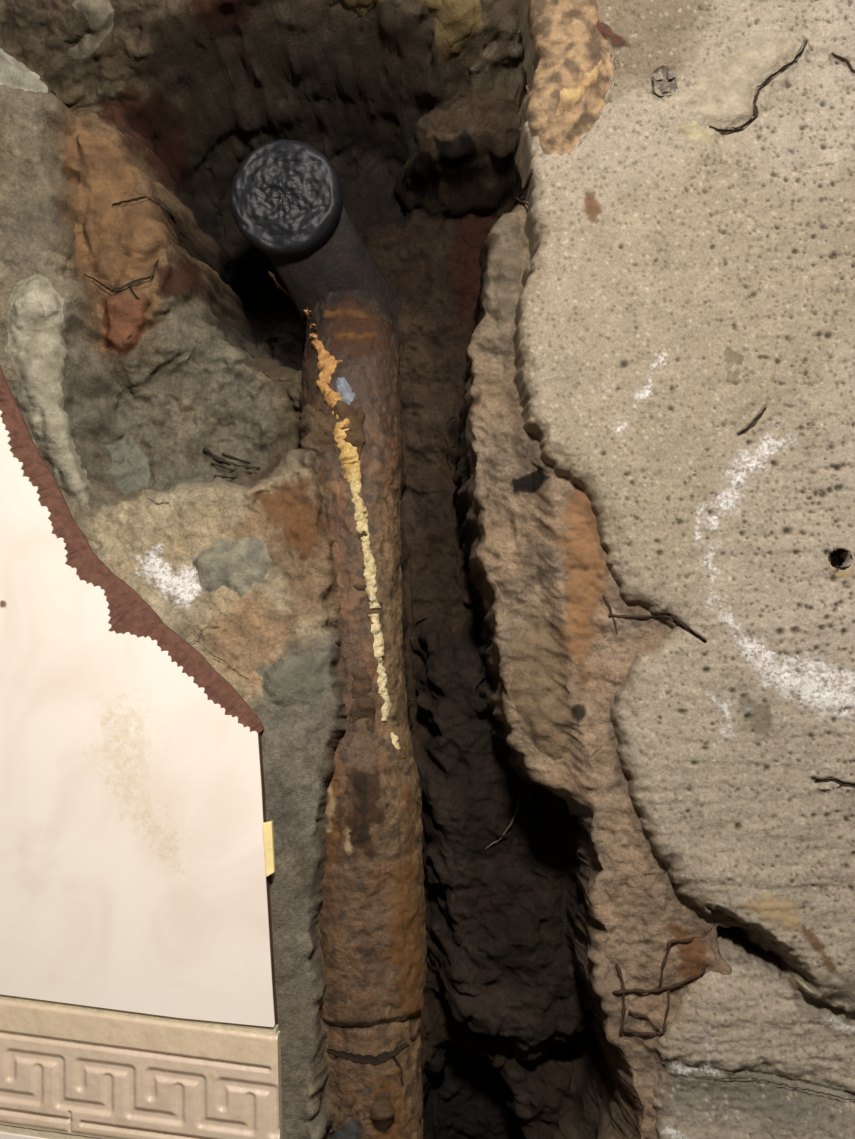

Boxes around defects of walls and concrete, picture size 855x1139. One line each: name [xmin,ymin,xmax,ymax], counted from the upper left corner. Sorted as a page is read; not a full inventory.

peeling [417,0,483,64]
spalling [523,0,619,155]
peeling [12,289,61,320]
peeling [335,377,355,405]
efflorescence [695,435,791,581]
damp [719,613,855,716]
corrosion [326,768,385,859]
crack [814,779,855,788]
spalling [591,1009,641,1137]
crack [670,1073,855,1102]